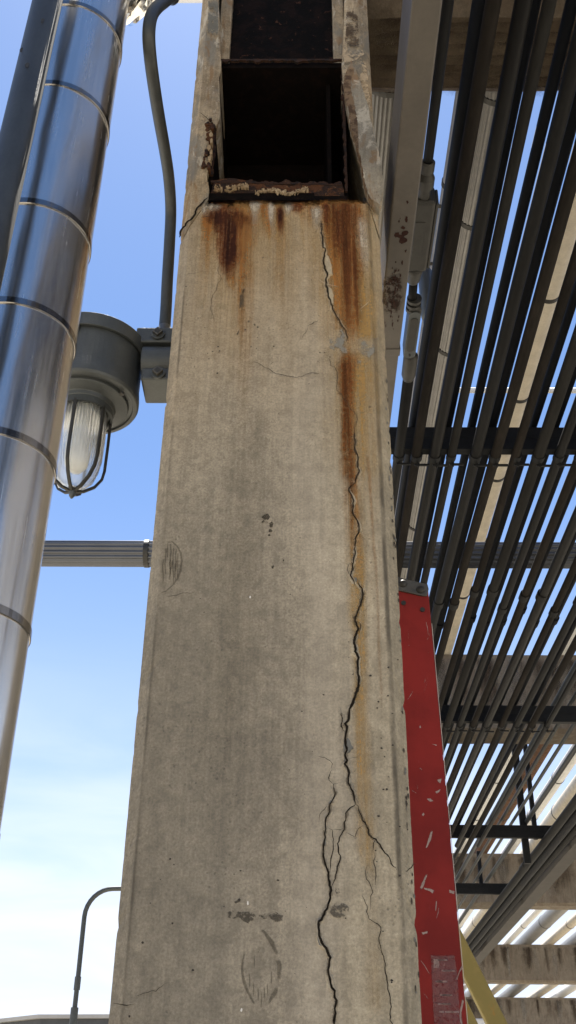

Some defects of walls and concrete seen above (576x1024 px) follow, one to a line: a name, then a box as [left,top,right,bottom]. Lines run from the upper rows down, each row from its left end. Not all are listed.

spalling [201,0,373,206]
crack [179,198,207,237]
rust [201,202,409,339]
crack [256,222,415,1024]
rust [338,352,373,801]